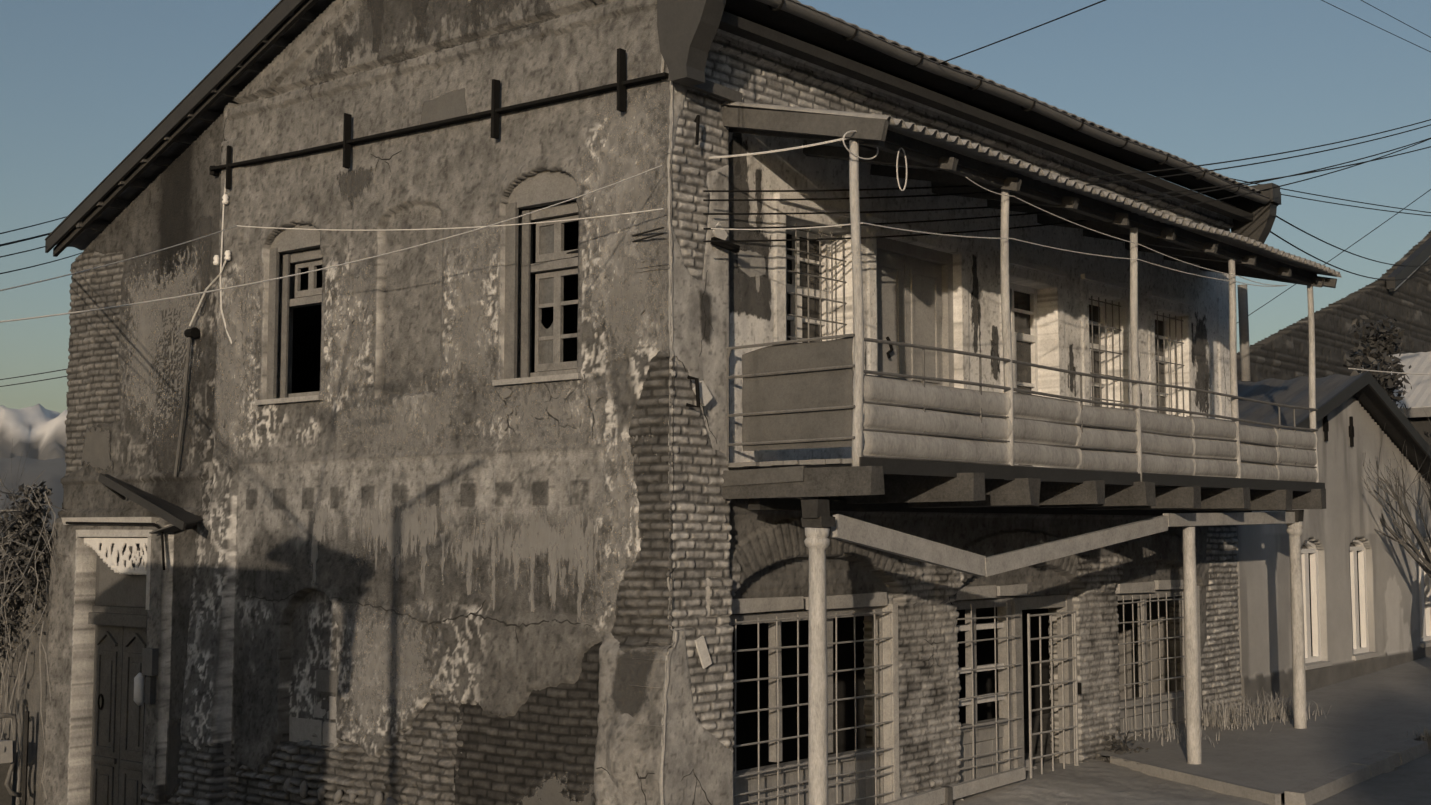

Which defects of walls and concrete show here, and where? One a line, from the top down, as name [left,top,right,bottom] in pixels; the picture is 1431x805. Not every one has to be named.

flaking render [140,35,1233,805]